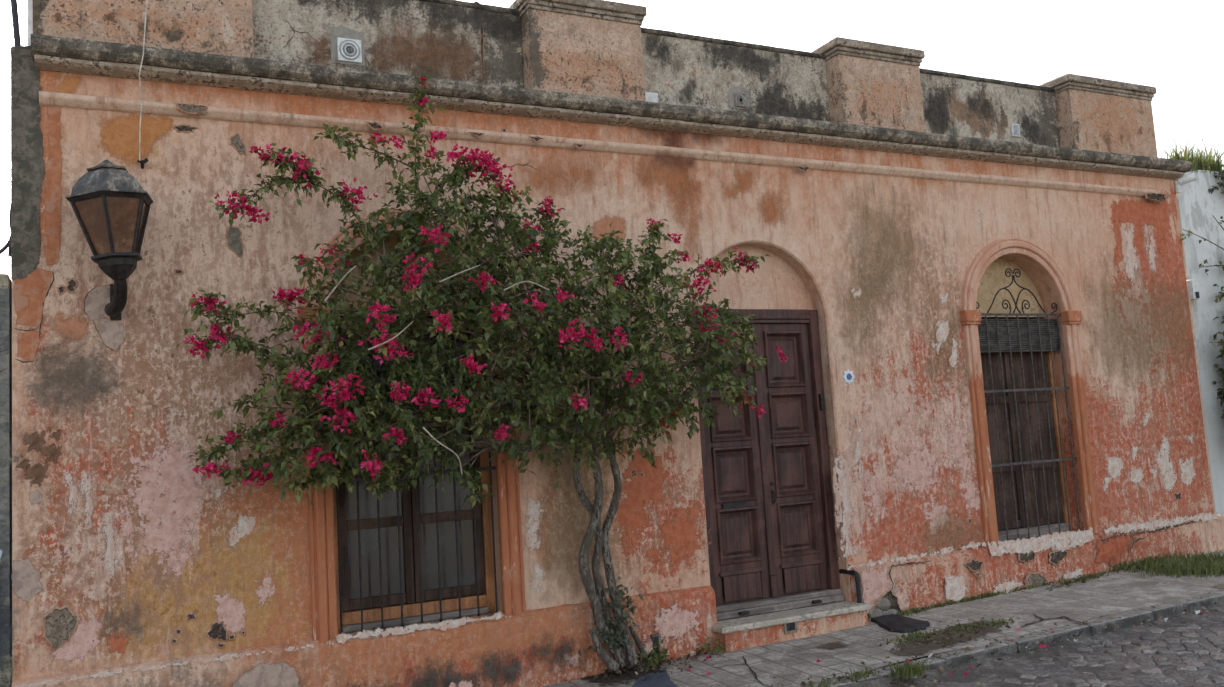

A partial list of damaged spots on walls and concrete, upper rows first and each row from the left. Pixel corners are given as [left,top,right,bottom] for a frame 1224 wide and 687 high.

water stain [335,0,521,81]
water stain [646,34,670,66]
water stain [679,80,696,103]
water stain [704,42,823,120]
peeling [98,112,198,164]
peeling [13,73,123,361]
peeling [0,550,43,601]
peeling [12,427,228,578]
peeling [228,514,257,547]
peeling [521,496,548,595]
peeling [833,412,1221,621]
peeling [0,573,512,687]